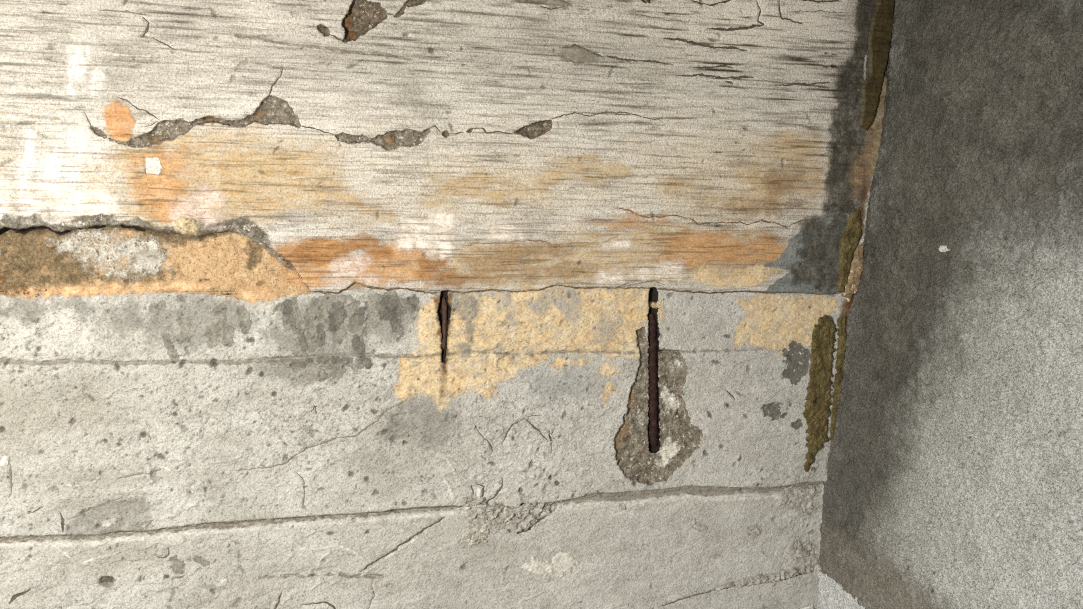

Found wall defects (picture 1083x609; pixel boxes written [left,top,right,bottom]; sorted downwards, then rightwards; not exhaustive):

water stain [67,39,105,100]
crack [85,0,660,176]
crack [558,0,845,86]
water stain [0,122,119,220]
water stain [168,186,225,235]
water stain [395,207,455,258]
rust [273,133,873,410]
water stain [598,261,685,285]
water stain [820,0,1083,565]
crack [475,415,552,452]
spalling [613,287,703,486]
crack [258,480,503,609]